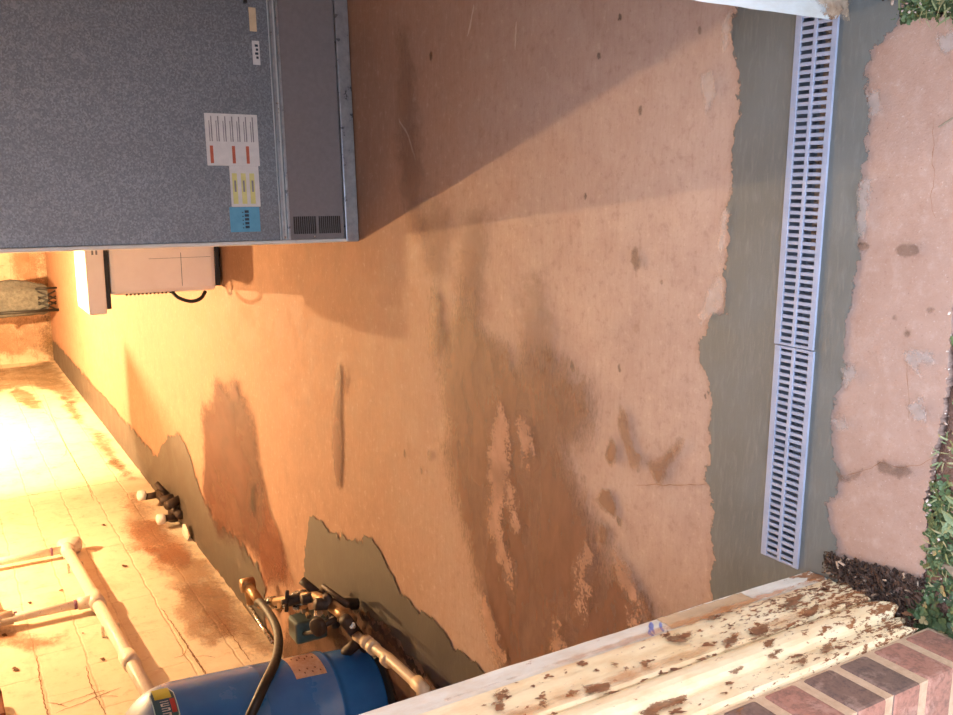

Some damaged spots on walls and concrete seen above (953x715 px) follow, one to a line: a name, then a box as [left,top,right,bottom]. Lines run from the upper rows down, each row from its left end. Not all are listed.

water stain [202,381,285,581]
water stain [429,290,651,668]
water stain [606,411,680,483]